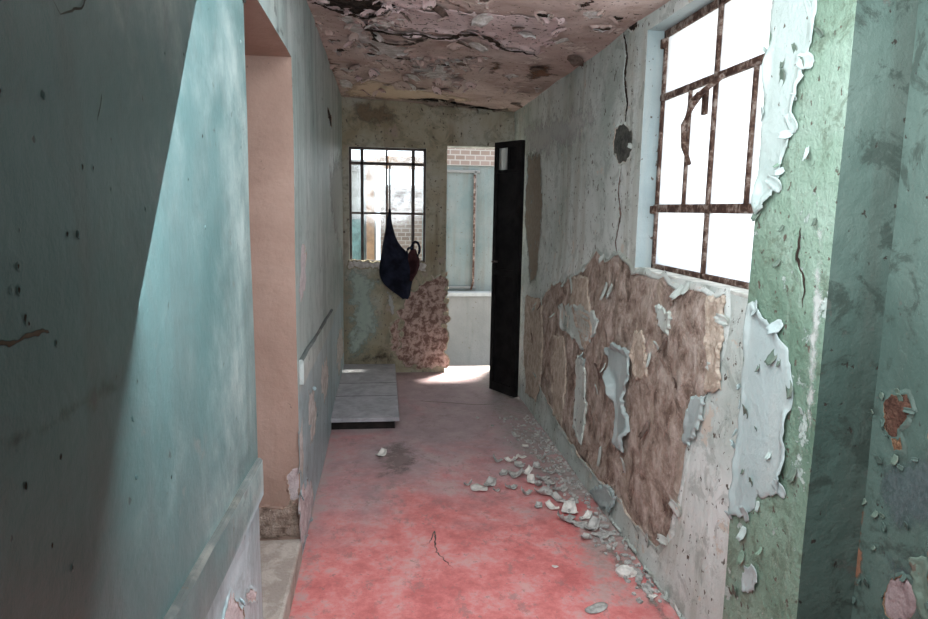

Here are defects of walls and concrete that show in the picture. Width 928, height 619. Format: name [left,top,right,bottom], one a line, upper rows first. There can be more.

crack [53,0,86,15]
peeling [306,0,569,104]
crack [352,19,540,58]
crack [570,0,594,12]
spalling [581,9,640,34]
peeling [750,0,823,222]
spalling [393,261,451,370]
spalling [523,248,731,619]
peeling [724,300,803,597]
spalling [871,388,918,471]
spalling [222,585,257,619]
spalling [880,536,928,619]